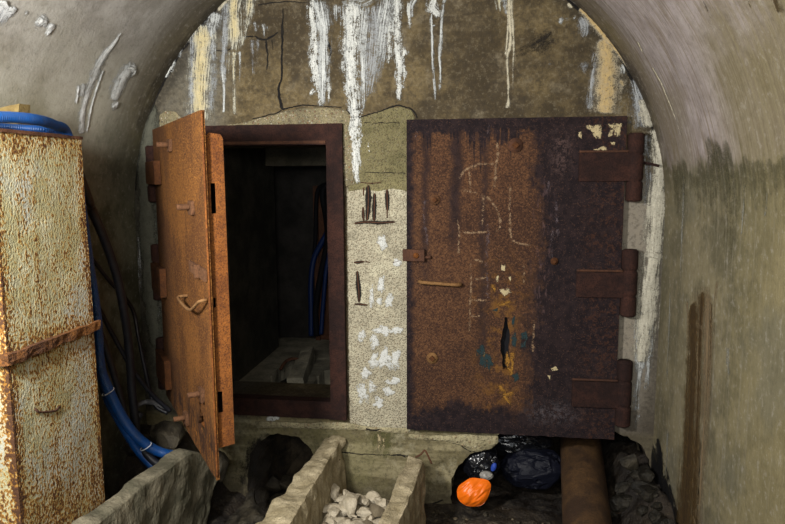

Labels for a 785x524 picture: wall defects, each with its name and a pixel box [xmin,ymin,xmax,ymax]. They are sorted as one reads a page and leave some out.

damp [0,0,28,22]
damp [35,14,57,36]
damp [75,33,121,134]
crack [148,0,230,123]
damp [165,0,268,118]
crack [214,1,417,124]
damp [306,0,446,183]
damp [495,0,554,108]
crack [614,51,641,99]
damp [567,3,670,409]
rust [505,352,515,375]
rust [676,283,717,524]